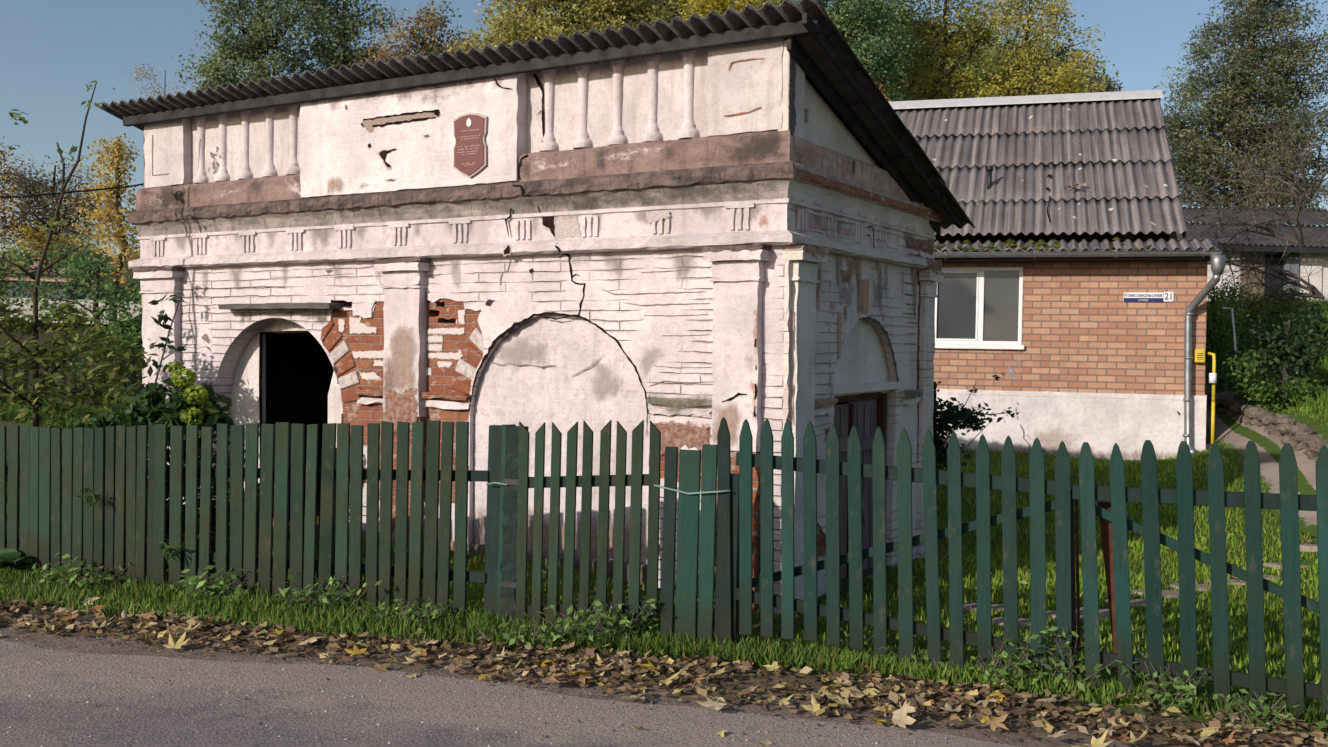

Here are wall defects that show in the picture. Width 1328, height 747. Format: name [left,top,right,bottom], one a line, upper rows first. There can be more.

spalling [361,109,440,182]
crack [495,73,545,285]
water stain [600,147,660,161]
spalling [321,288,491,504]
crack [470,243,758,432]
flaking render [816,269,869,388]